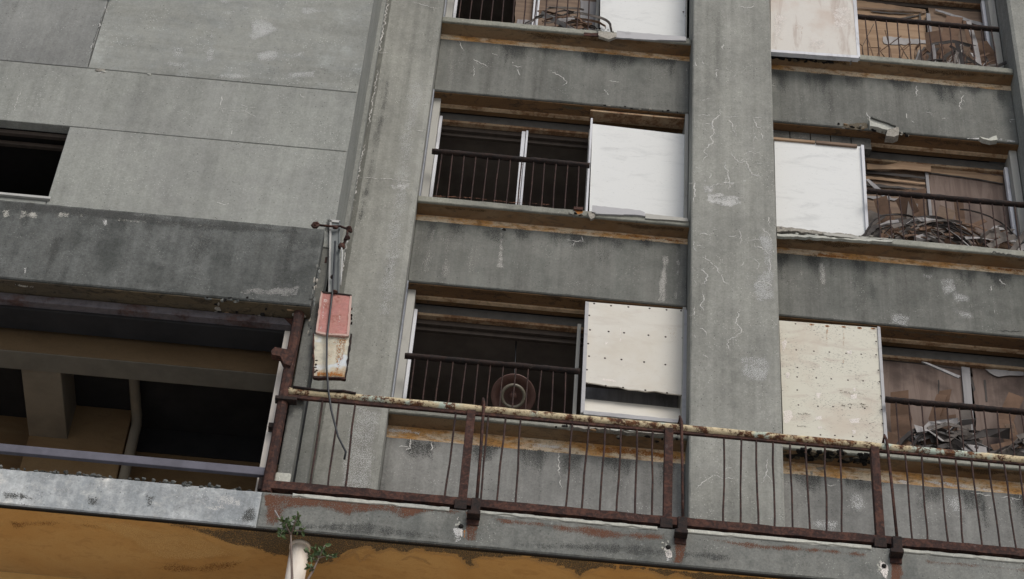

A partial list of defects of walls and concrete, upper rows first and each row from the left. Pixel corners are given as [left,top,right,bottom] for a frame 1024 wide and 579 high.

crack [693,44,763,201]
spalling [773,115,909,157]
leakage [6,202,298,276]
crack [691,217,774,357]
leakage [168,493,279,555]
rust [264,493,478,541]
rust [496,518,686,563]
leakage [516,542,730,561]